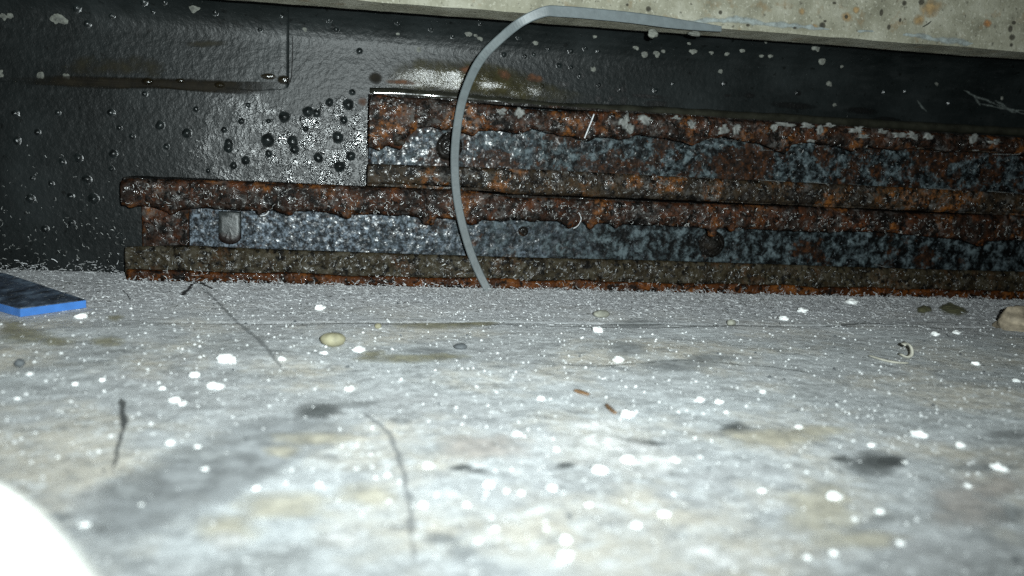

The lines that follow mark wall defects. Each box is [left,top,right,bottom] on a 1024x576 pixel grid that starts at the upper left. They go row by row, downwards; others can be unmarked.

leakage [369,61,541,99]
rust [368,94,1024,156]
rust [120,178,1024,246]
crack [181,281,212,296]
rust [126,269,1024,300]